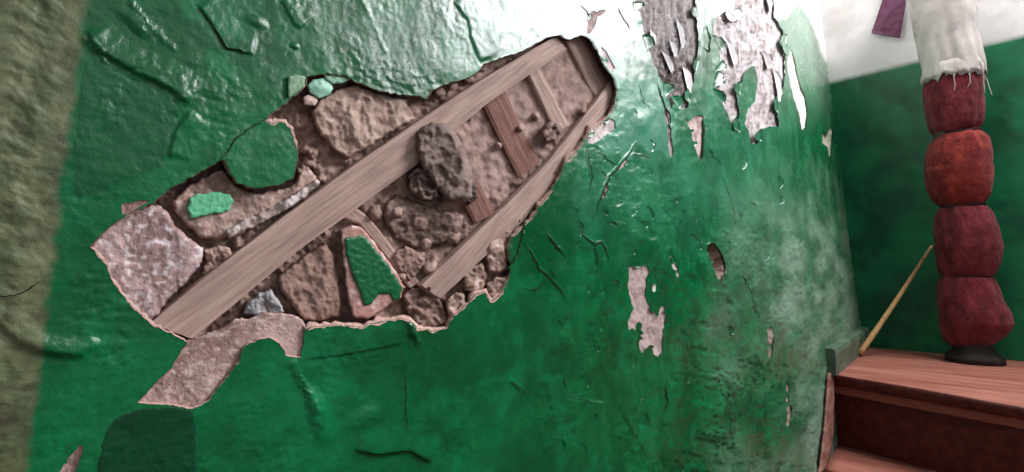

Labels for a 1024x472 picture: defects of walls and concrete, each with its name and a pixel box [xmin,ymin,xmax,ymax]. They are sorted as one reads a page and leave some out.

peeling [632,0,721,168]
peeling [712,0,808,144]
flaking render [90,8,618,409]
crack [504,140,649,301]
peeling [594,245,666,368]
flaking render [630,197,732,282]